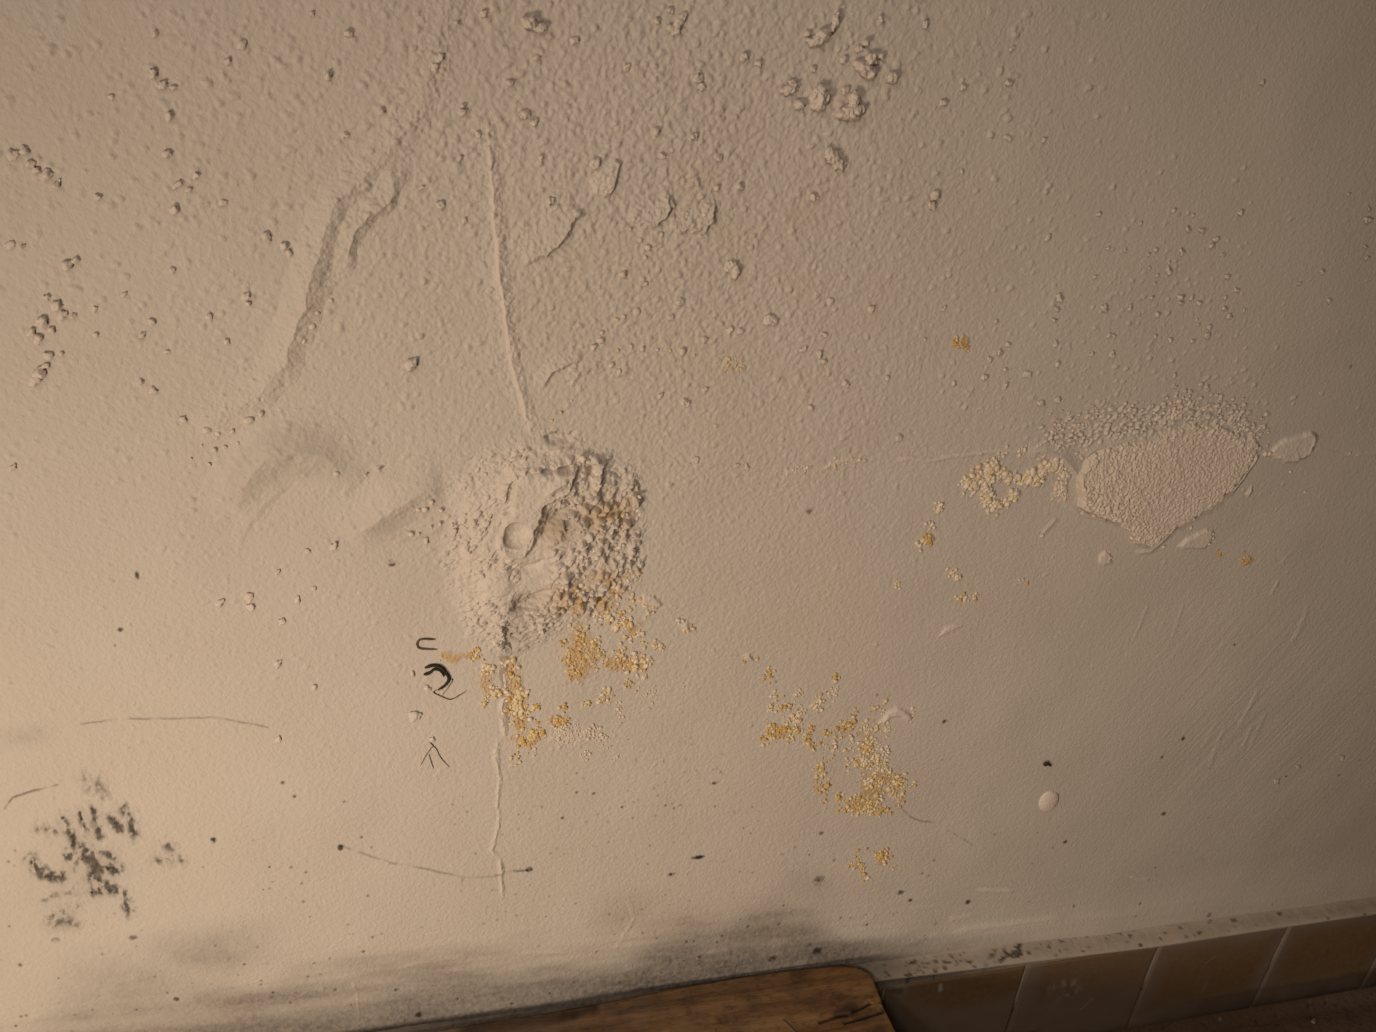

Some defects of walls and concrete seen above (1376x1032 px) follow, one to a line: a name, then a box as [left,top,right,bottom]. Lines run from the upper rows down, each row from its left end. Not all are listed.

flaking render [436,307,696,659]
damp [957,457,1072,517]
damp [439,568,666,766]
damp [755,666,917,818]
damp [0,767,1045,1032]